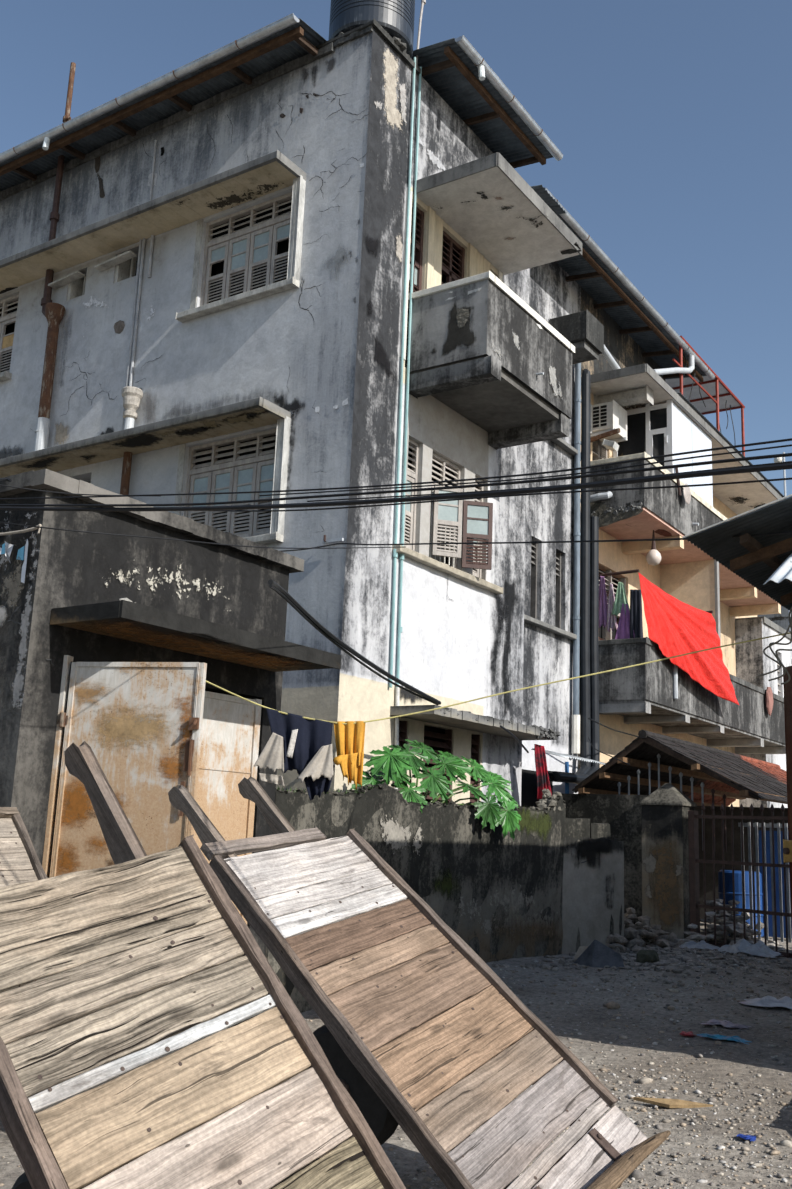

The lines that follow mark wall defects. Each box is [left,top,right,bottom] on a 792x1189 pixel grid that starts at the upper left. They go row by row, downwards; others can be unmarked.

peeling [375,49,407,129]
water stain [206,183,284,210]
crack [275,91,367,244]
crack [61,355,162,416]
water stain [375,338,394,377]
water stain [491,582,518,716]
corrosion [75,686,105,704]
corrosion [98,698,193,779]
corrosion [61,782,92,825]
corrosion [56,846,77,873]
water stain [564,840,614,908]